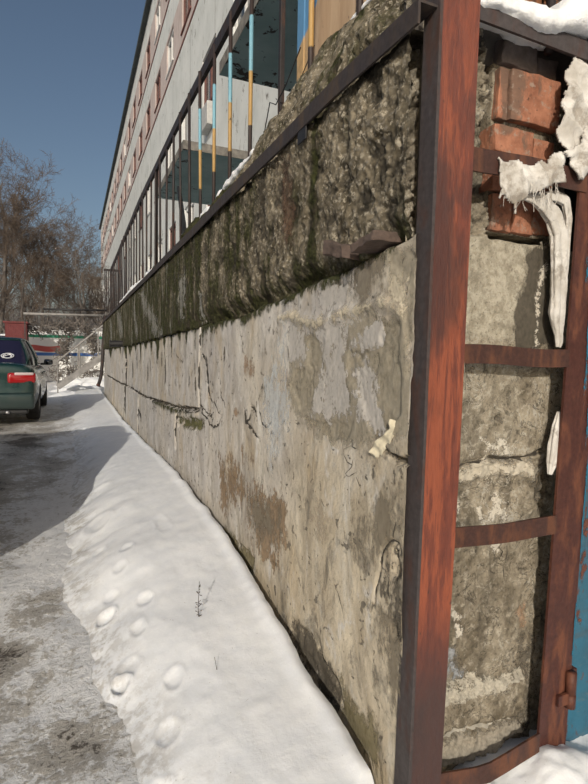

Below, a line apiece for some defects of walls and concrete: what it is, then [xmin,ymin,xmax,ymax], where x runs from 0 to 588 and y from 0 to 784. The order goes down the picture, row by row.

leakage [134,290,164,339]
leakage [178,276,186,319]
flaking render [287,246,416,468]
crack [107,334,225,436]
crack [244,406,271,438]
leakage [224,528,255,573]
leakage [288,619,381,767]